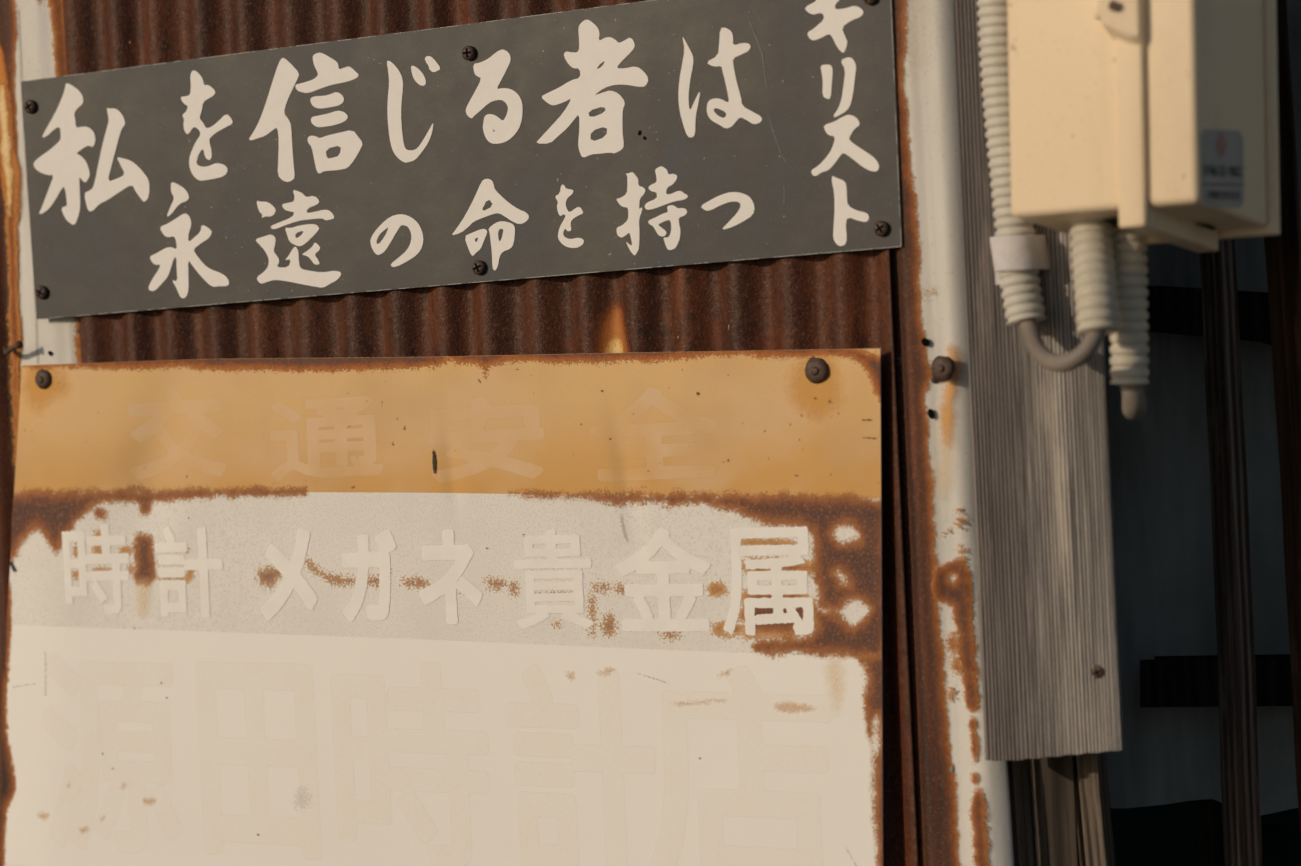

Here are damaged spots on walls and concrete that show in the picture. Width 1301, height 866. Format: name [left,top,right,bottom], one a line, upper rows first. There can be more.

rust [0,0,990,866]